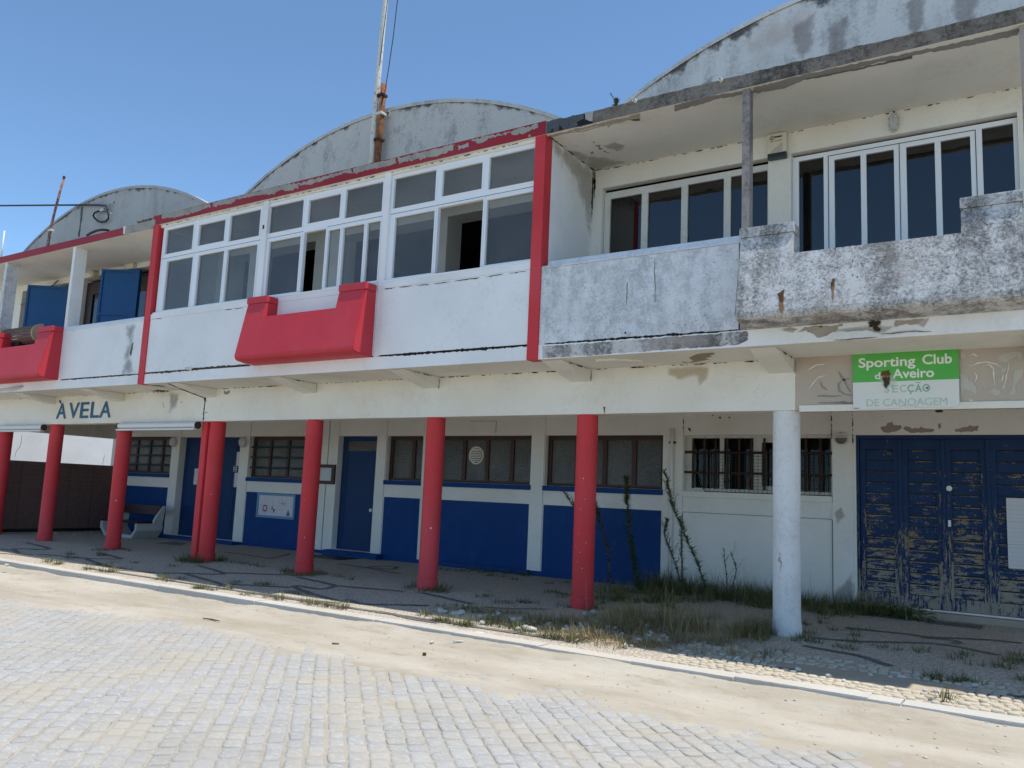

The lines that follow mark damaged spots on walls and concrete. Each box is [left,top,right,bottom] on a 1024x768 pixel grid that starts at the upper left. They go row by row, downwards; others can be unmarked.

water stain [656,21,757,82]
peeling [123,123,538,234]
peeling [784,319,931,341]
peeling [682,353,714,363]
peeling [880,422,941,433]